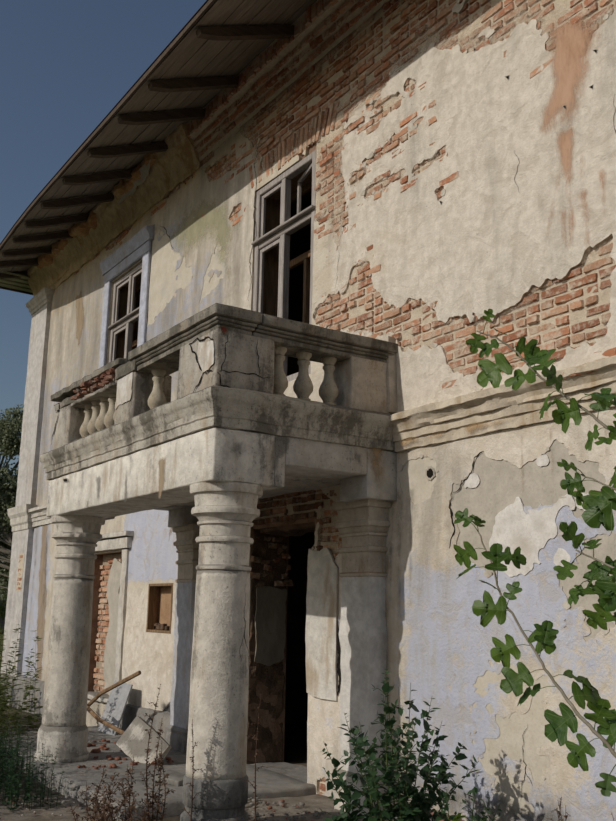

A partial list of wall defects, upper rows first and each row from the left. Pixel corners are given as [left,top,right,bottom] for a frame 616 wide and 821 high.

flaking render [151,0,616,258]
flaking render [314,236,616,389]
flaking render [70,368,133,409]
crack [189,336,271,390]
flaking render [250,489,342,560]
flaking render [397,454,439,505]
crack [449,452,482,548]
flaking render [451,439,606,578]
flaking render [554,532,616,642]